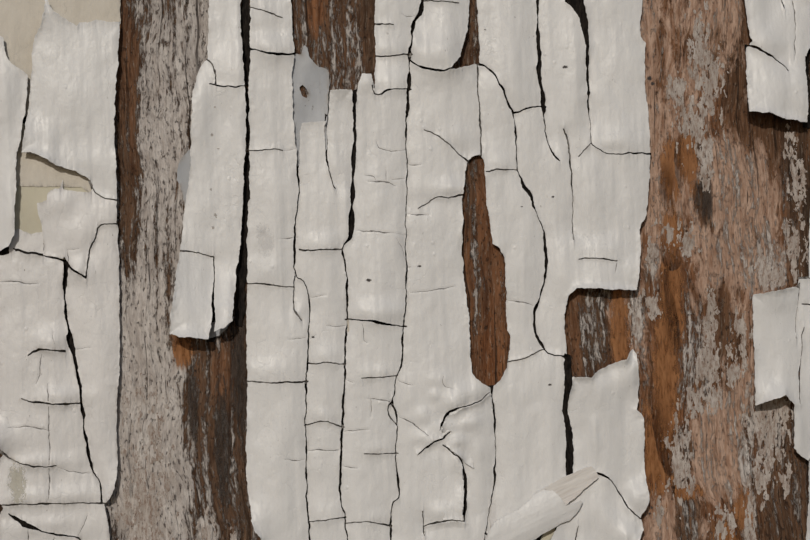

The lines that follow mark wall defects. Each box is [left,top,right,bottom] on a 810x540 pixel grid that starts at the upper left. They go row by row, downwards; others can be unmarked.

crack [0,223,118,540]
crack [88,181,117,201]
peeling [0,0,309,540]
crack [180,250,216,342]
crack [205,0,651,540]
peeling [291,0,810,540]
crack [744,0,810,128]
crack [795,277,810,400]